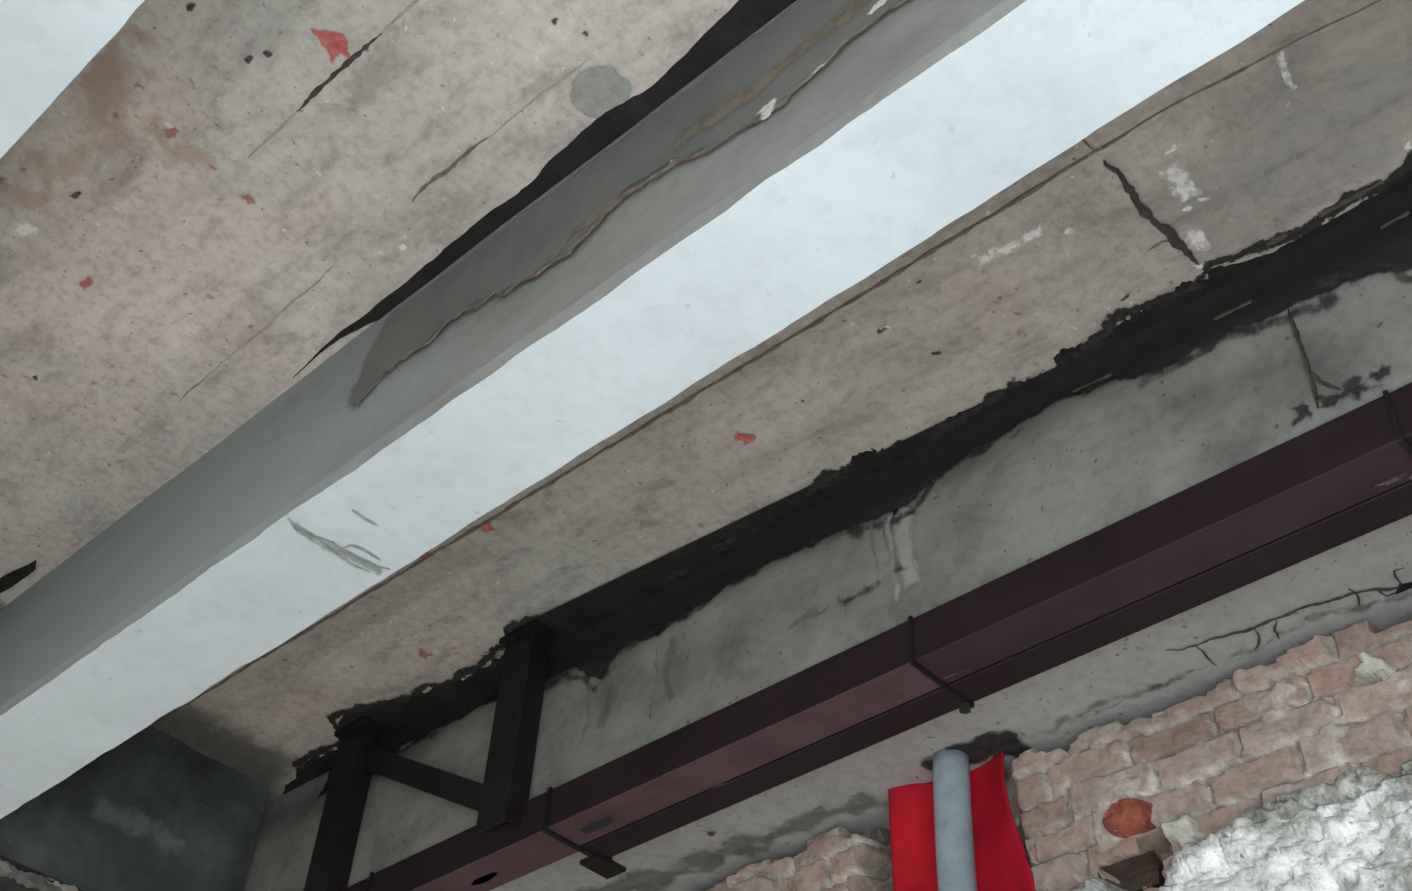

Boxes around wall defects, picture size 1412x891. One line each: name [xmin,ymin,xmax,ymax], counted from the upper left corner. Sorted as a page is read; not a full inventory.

leakage [570,66,631,118]
peeling [349,0,910,407]
crack [152,0,1412,727]
spalling [946,730,1031,764]
peeling [1074,758,1412,891]